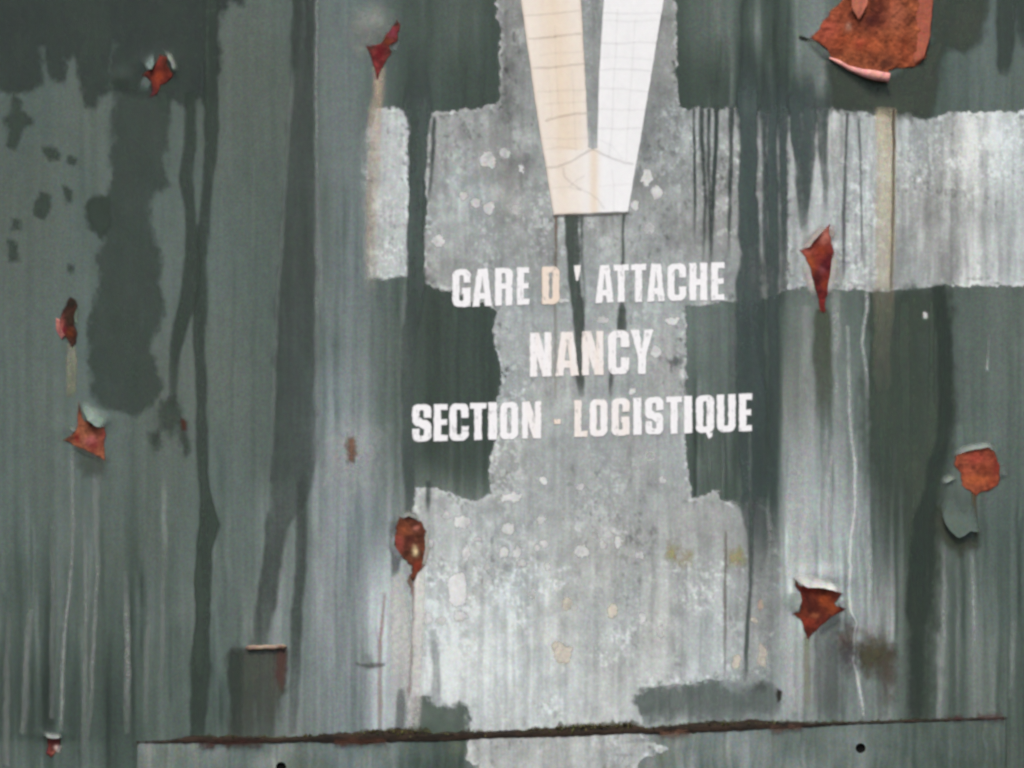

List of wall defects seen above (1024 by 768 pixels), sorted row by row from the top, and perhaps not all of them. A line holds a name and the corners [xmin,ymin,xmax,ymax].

peeling [366,106,410,280]
peeling [755,107,1024,313]
water stain [0,0,242,735]
peeling [389,0,777,768]
peeling [942,443,1007,538]
rust [137,713,1006,748]